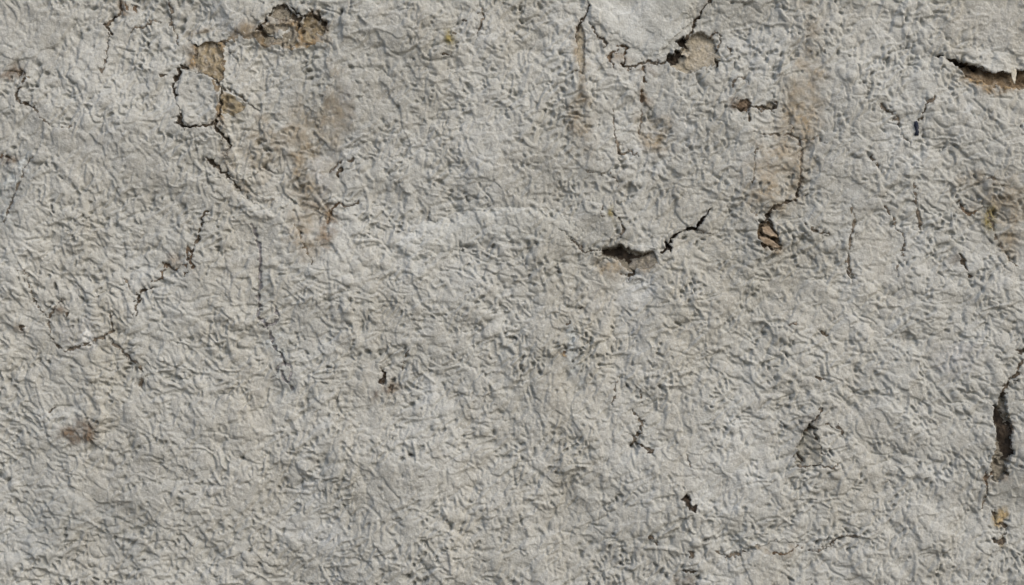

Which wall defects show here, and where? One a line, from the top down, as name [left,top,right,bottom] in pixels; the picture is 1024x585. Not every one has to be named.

crack [592,26,666,83]
spalling [935,49,1024,93]
peeling [159,0,333,205]
crack [733,97,858,279]
crack [571,205,626,253]
crack [660,208,711,254]
crack [884,183,923,277]
crack [1002,348,1024,387]